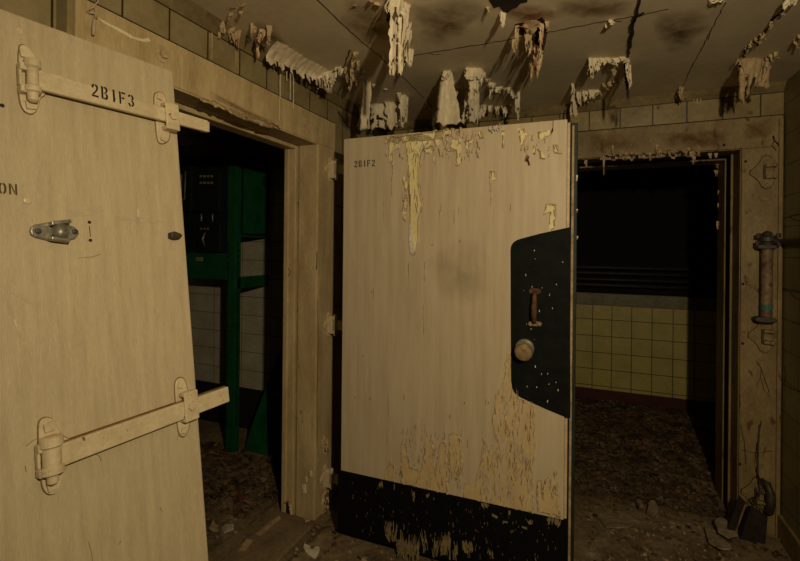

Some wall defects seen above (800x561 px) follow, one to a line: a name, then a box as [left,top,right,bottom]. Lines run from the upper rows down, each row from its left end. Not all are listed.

peeling [217,0,562,255]
peeling [570,57,632,117]
peeling [600,144,719,176]
peeling [734,0,798,106]
peeling [367,352,561,561]